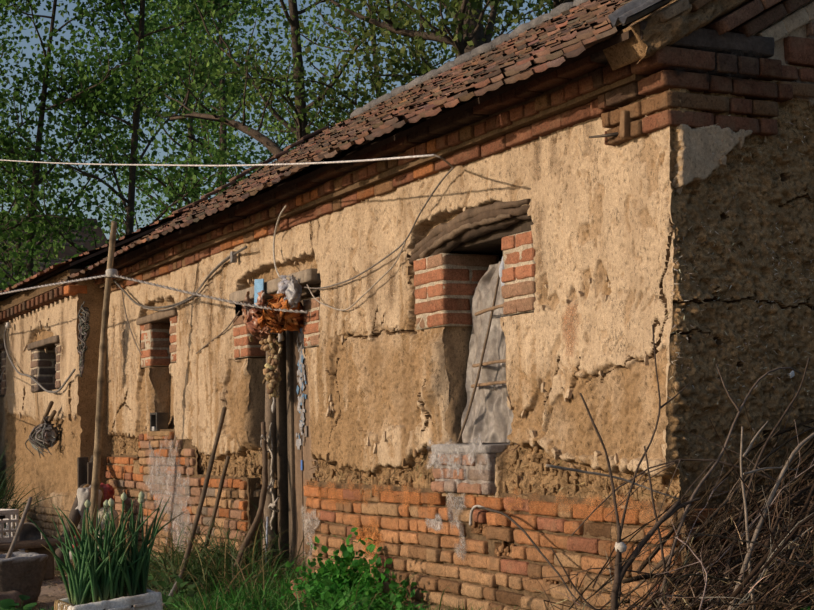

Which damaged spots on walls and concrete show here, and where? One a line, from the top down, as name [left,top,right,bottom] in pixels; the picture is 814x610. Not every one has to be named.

peeling [672,124,752,195]
crack [778,187,814,207]
crack [544,218,814,405]
crack [111,388,131,432]